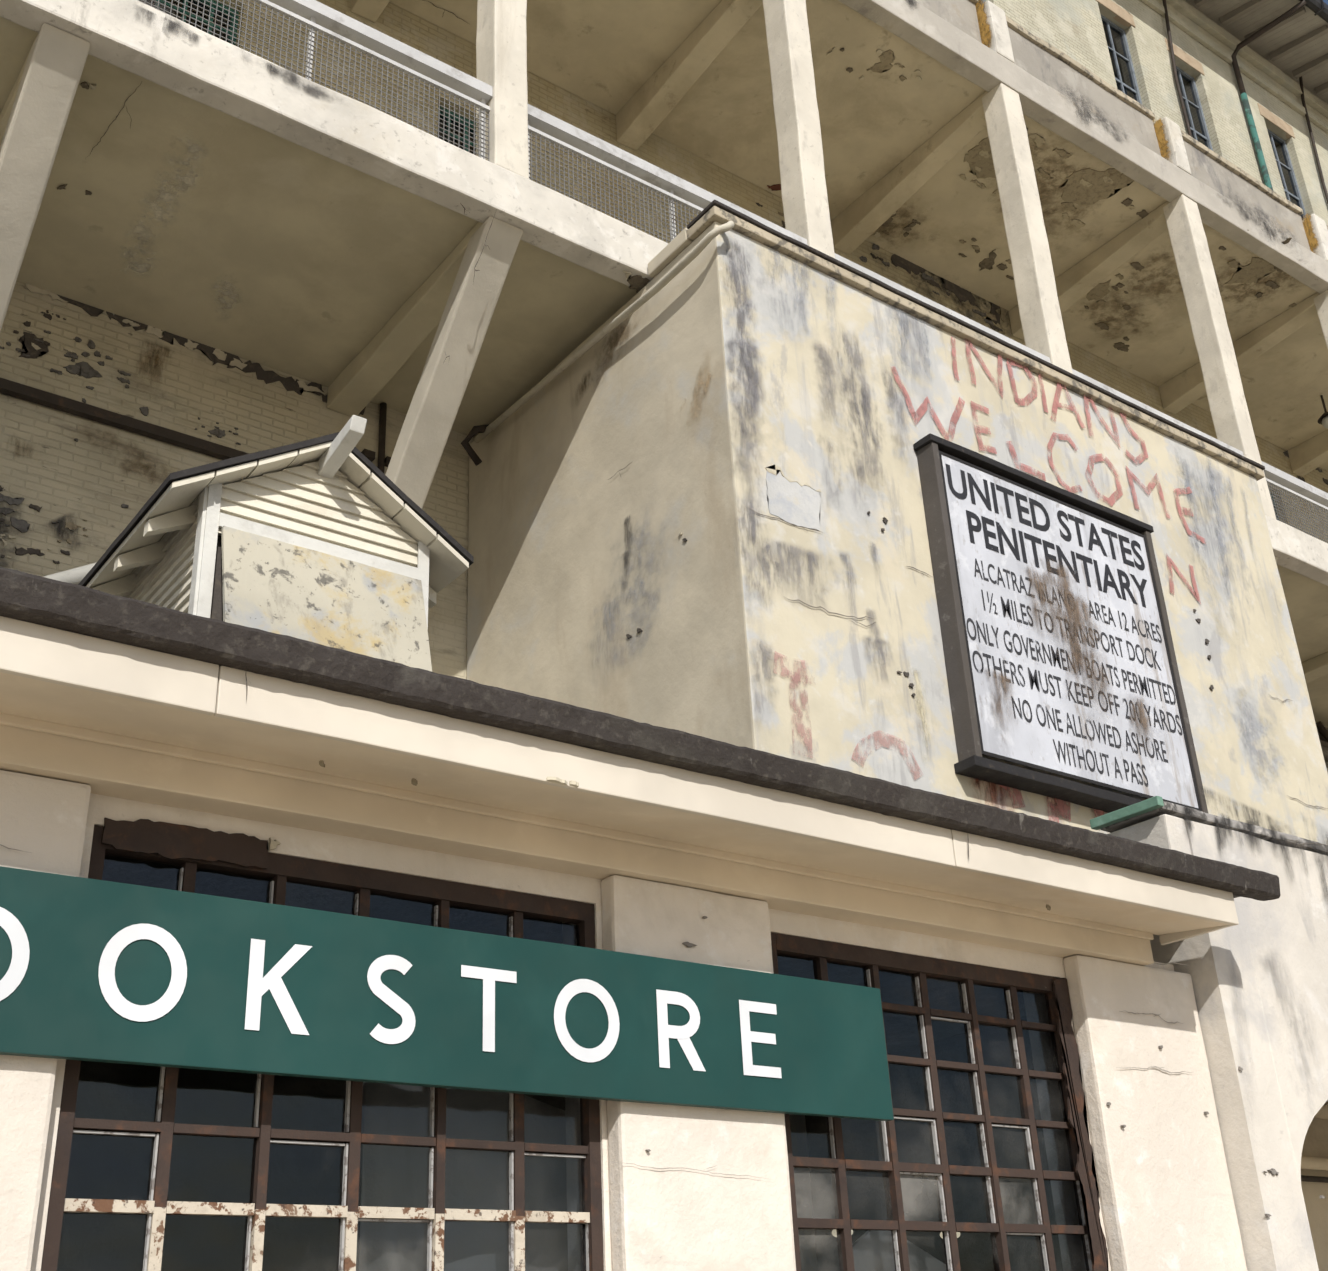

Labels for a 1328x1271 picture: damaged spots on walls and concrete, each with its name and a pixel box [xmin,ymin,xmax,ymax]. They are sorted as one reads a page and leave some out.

peeling [960,137,999,196]
peeling [1026,127,1149,229]
water stain [911,270,986,319]
peeling [1084,262,1144,311]
peeling [1218,246,1283,298]
peeling [0,284,328,403]
water stain [738,309,758,406]
water stain [819,338,869,425]
peeling [0,485,88,564]
water stain [750,505,814,575]
peeling [101,817,281,869]
water stain [1216,815,1231,846]